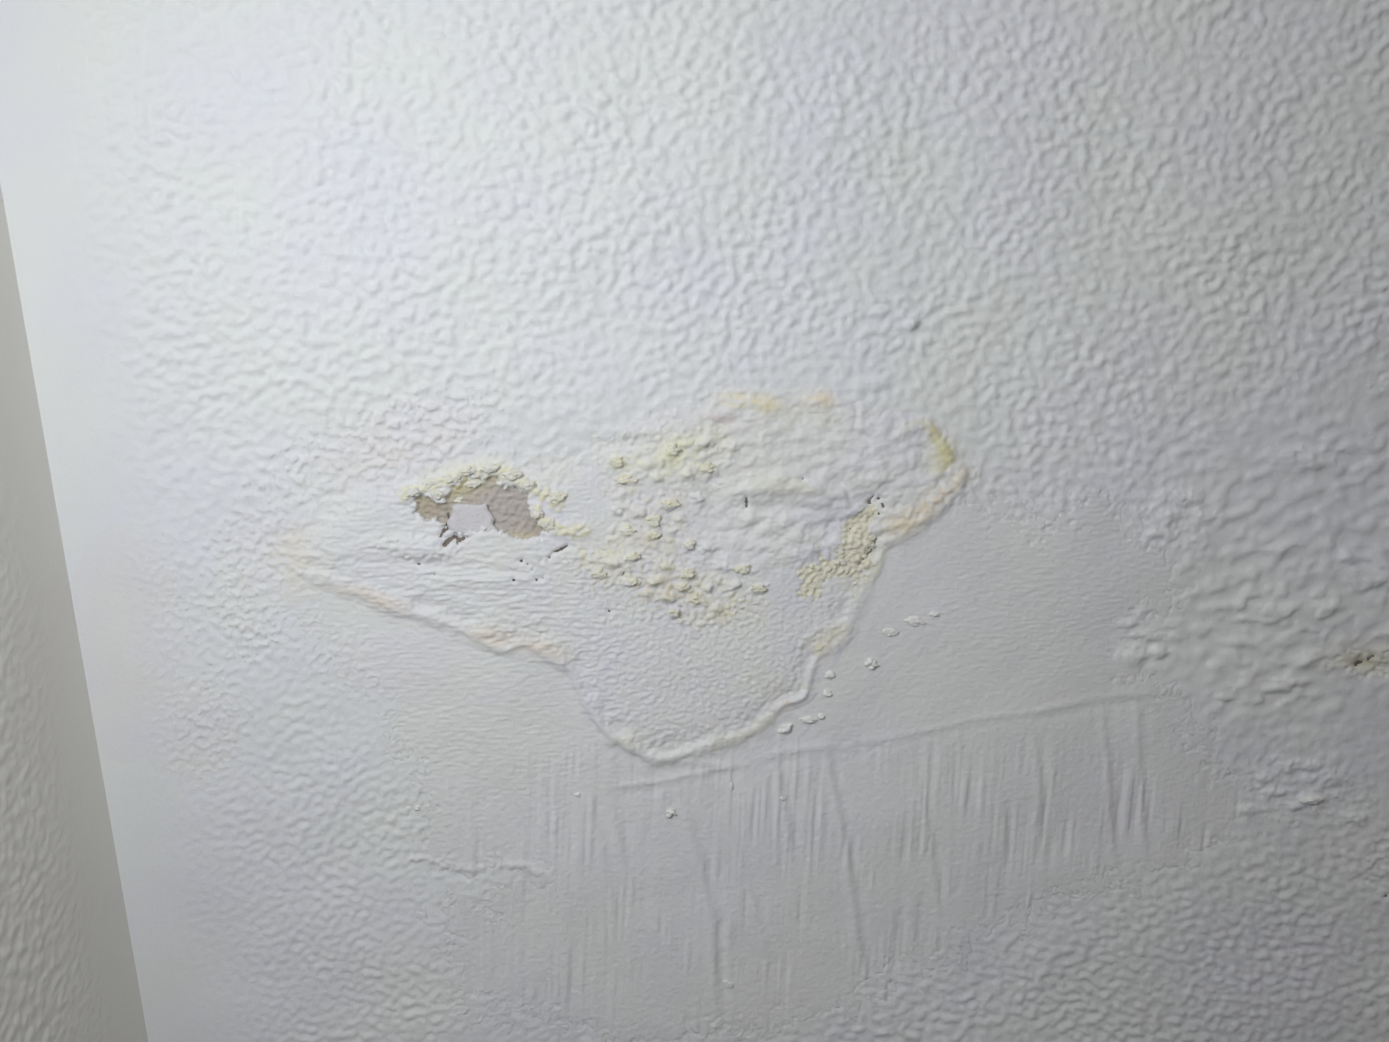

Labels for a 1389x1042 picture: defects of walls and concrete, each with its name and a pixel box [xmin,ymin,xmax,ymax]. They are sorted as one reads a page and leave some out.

flaking render [1334,650,1389,678]